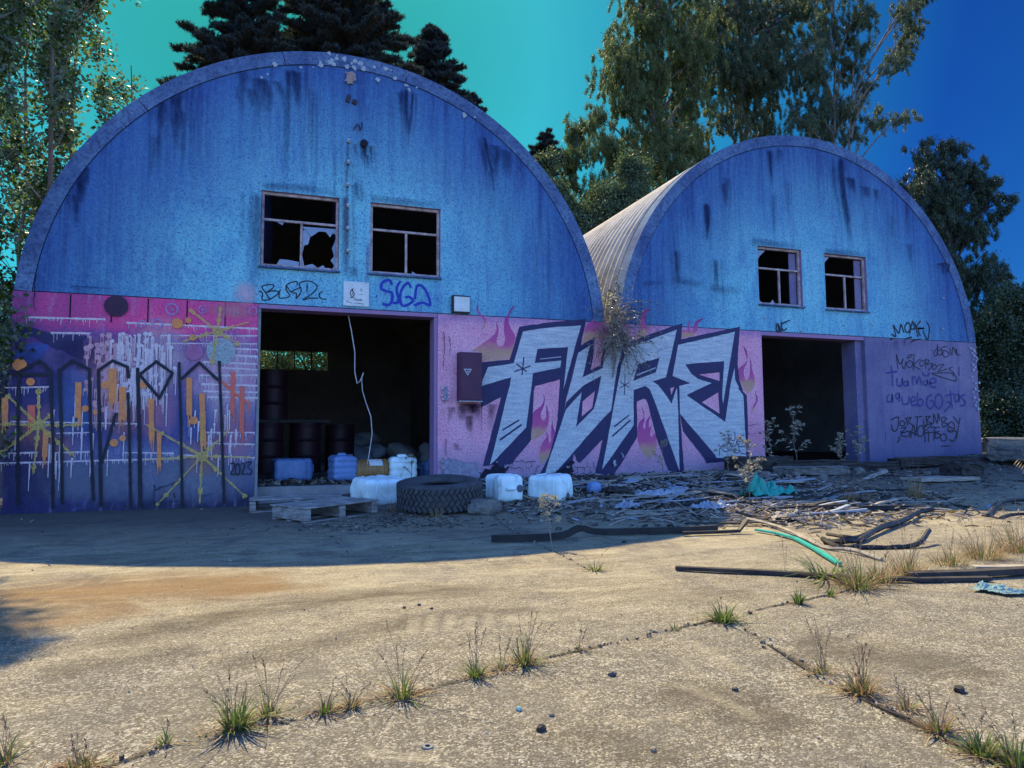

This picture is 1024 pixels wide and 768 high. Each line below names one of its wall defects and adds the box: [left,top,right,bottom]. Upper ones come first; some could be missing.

spalling [344,71,356,85]
water stain [840,159,849,221]